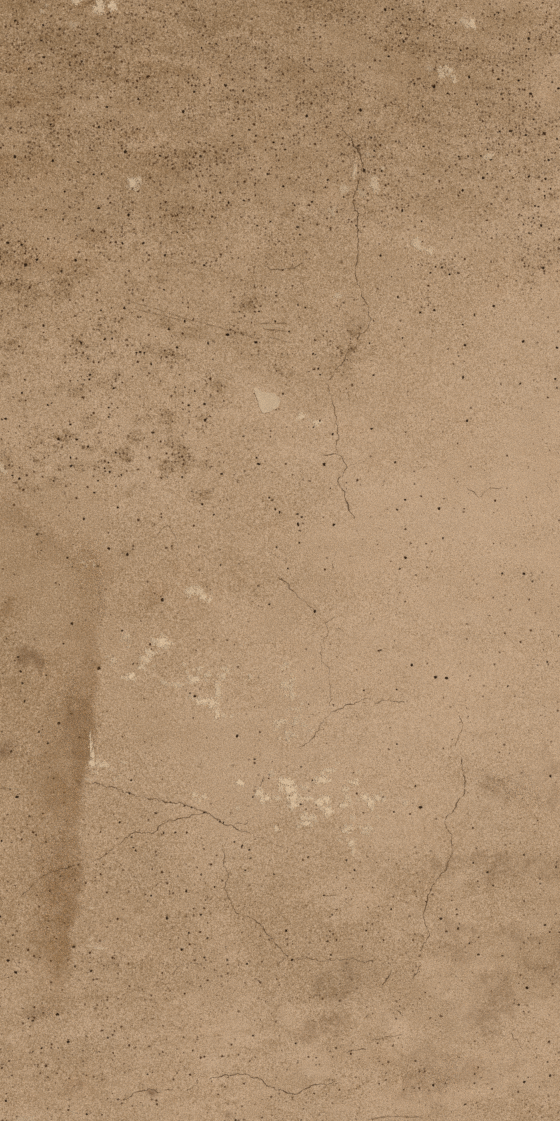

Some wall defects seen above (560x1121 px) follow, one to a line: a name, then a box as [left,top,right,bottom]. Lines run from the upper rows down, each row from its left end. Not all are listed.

crack [326,127,371,518]
crack [1,716,466,985]
crack [298,698,404,748]